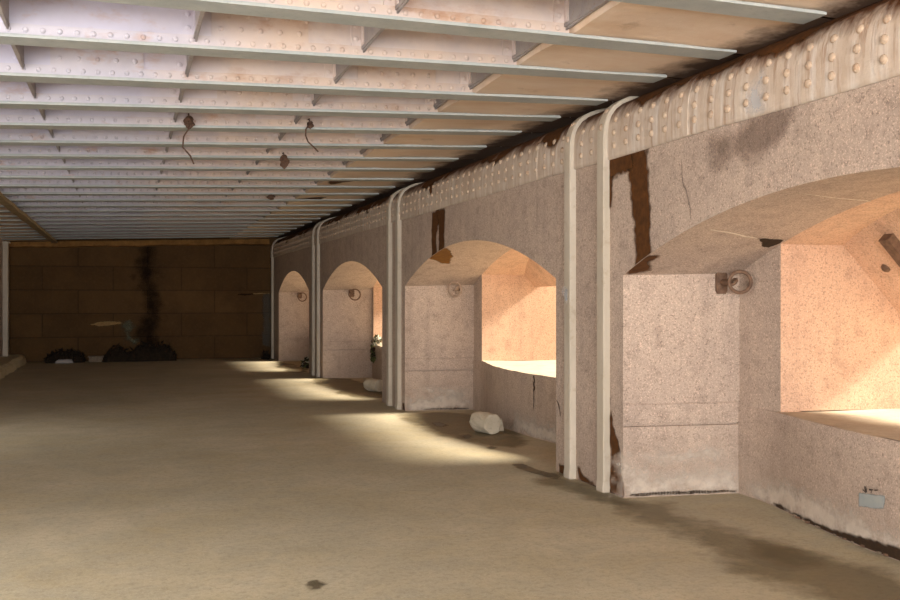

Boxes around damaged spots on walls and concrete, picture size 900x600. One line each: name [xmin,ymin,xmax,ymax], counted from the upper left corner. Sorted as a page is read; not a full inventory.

rust [430,209,453,264]
rust [609,149,659,274]
rust [610,413,624,497]
water stain [513,463,900,600]